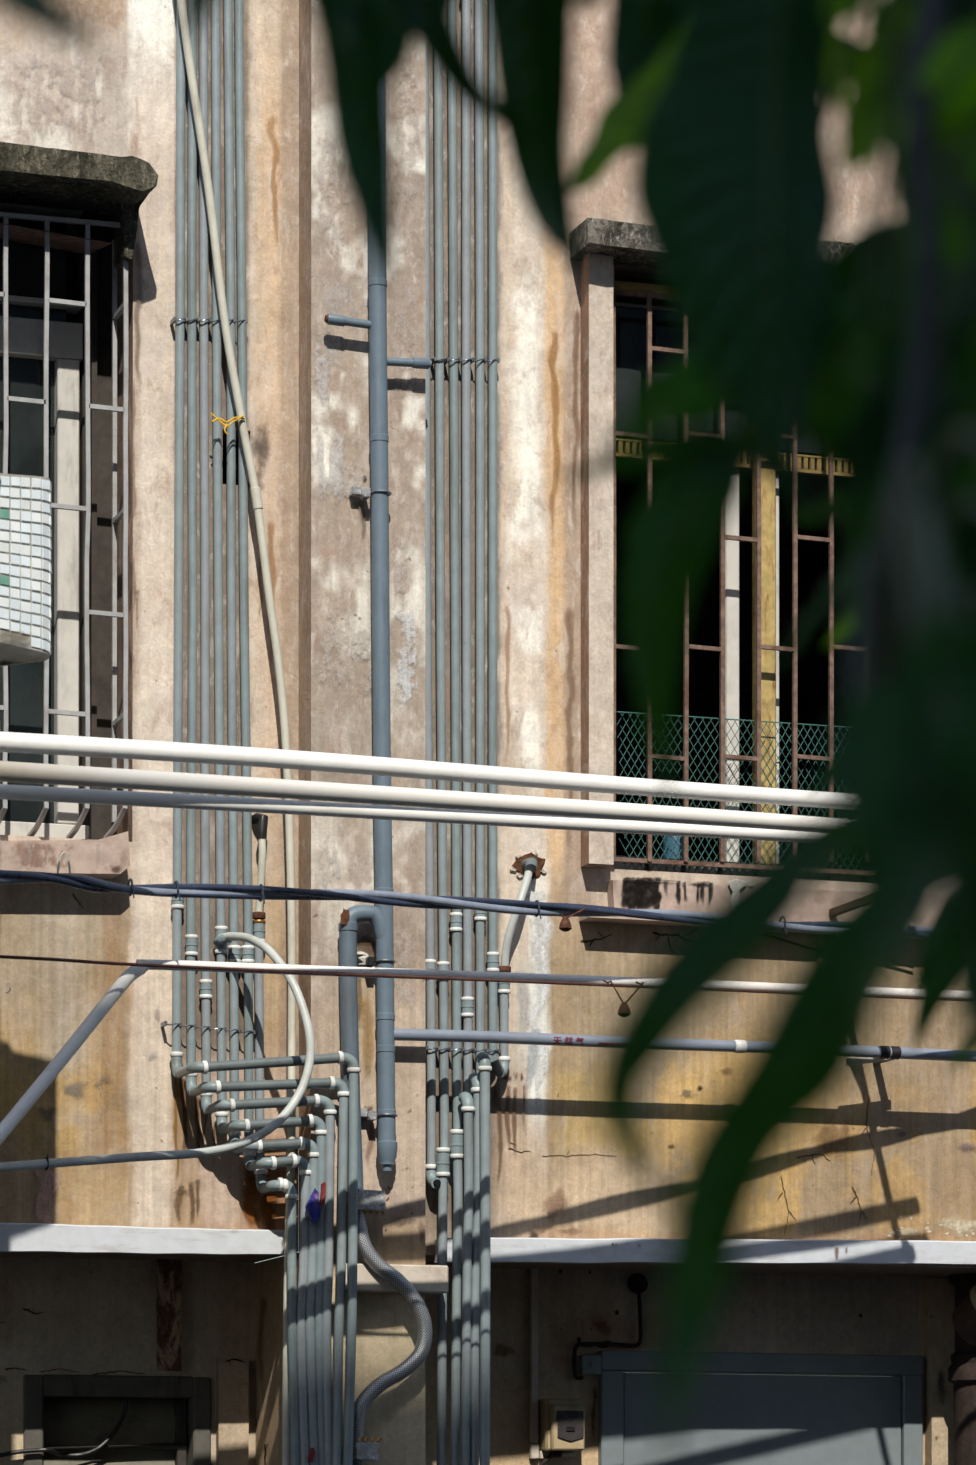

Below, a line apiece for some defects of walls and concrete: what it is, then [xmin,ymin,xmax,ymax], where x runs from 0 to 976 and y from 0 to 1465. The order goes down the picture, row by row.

peeling [396,610,417,702]
crack [779,1154,827,1233]
crack [850,1098,875,1225]